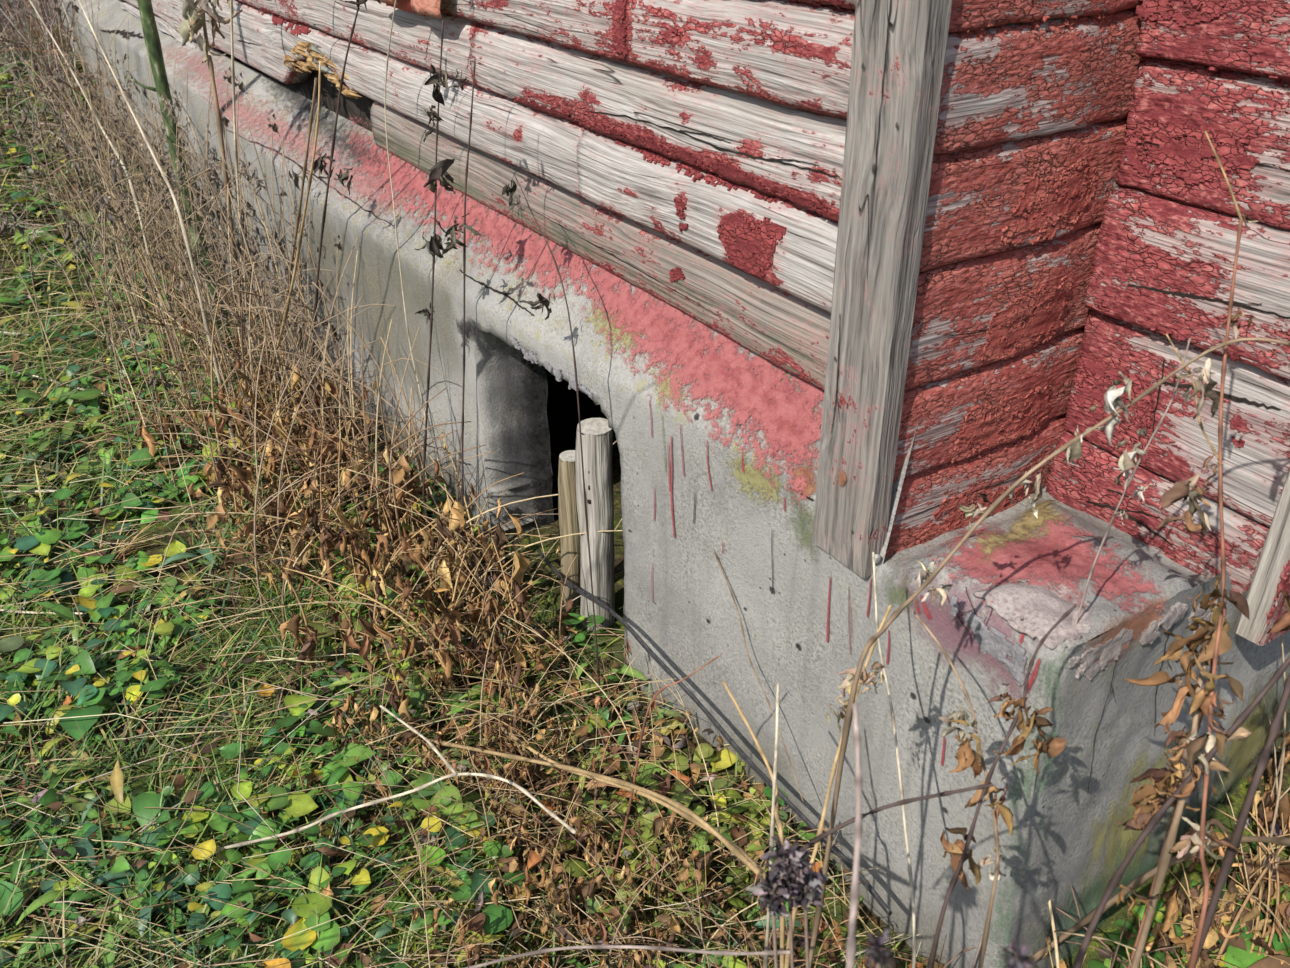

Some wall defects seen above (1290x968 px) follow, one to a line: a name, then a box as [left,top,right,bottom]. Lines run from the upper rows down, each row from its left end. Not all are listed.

peeling [513,96,839,280]
crack [589,111,840,178]
crack [867,0,891,268]
peeling [1001,156,1098,246]
peeling [1122,116,1260,185]
crack [1211,156,1290,171]
crack [943,325,997,336]
peeling [980,276,1072,362]
spalling [509,335,593,399]
crack [898,475,1023,522]
peeling [919,480,1033,544]
spalling [1067,602,1211,681]